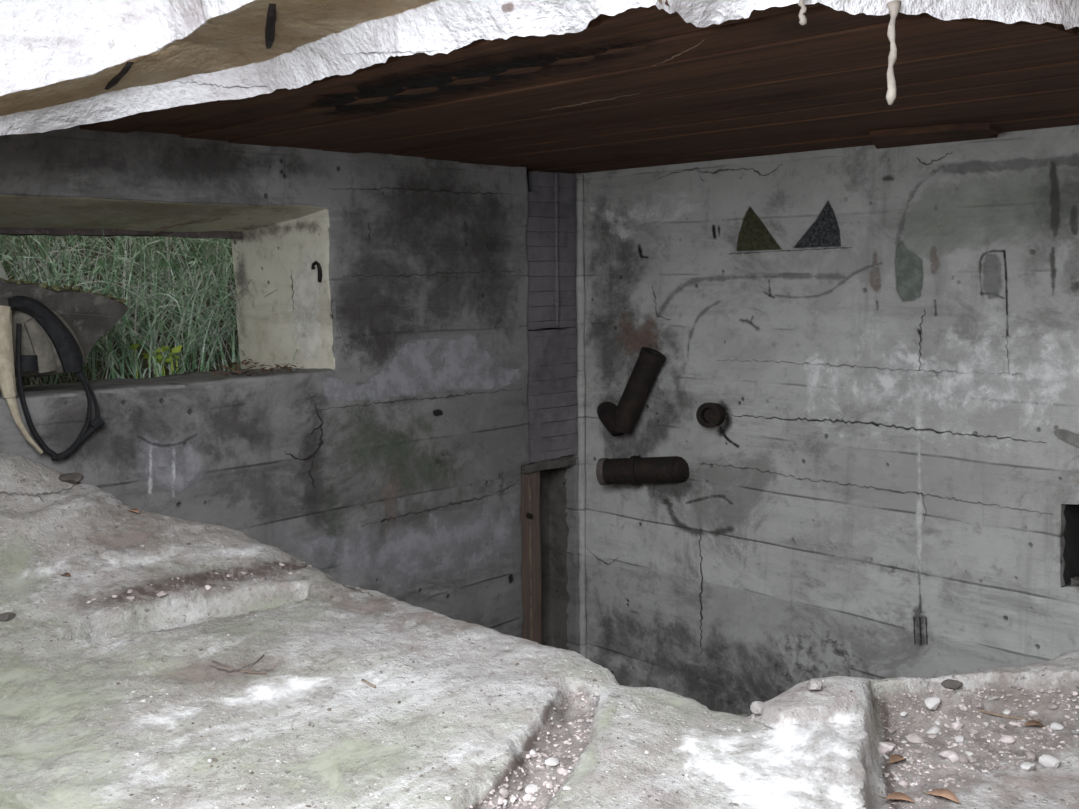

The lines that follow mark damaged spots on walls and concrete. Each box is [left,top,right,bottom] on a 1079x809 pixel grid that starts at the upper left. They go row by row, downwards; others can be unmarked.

damp [295,508,516,587]
crack [697,528,705,654]
damp [652,639,801,716]